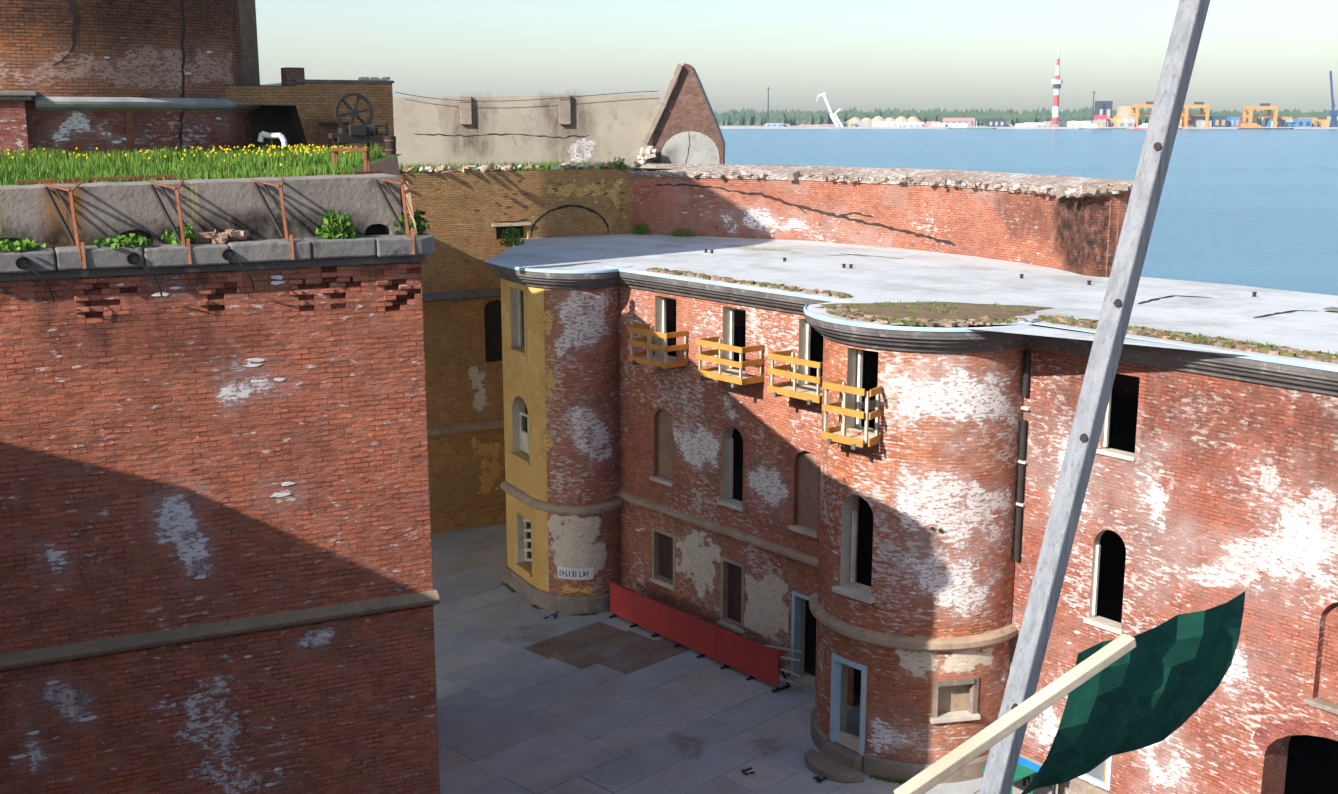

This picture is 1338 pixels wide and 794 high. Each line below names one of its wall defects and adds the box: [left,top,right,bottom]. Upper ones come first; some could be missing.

crack [52,0,79,66]
crack [179,0,187,150]
crack [656,131,955,257]
spalling [289,264,422,312]
damp [216,355,285,405]
peeling [547,513,607,596]
peeling [675,529,722,612]
peeling [744,564,789,647]
damp [876,467,1014,617]
damp [1150,485,1338,592]
damp [148,673,286,794]
damp [1137,734,1191,791]